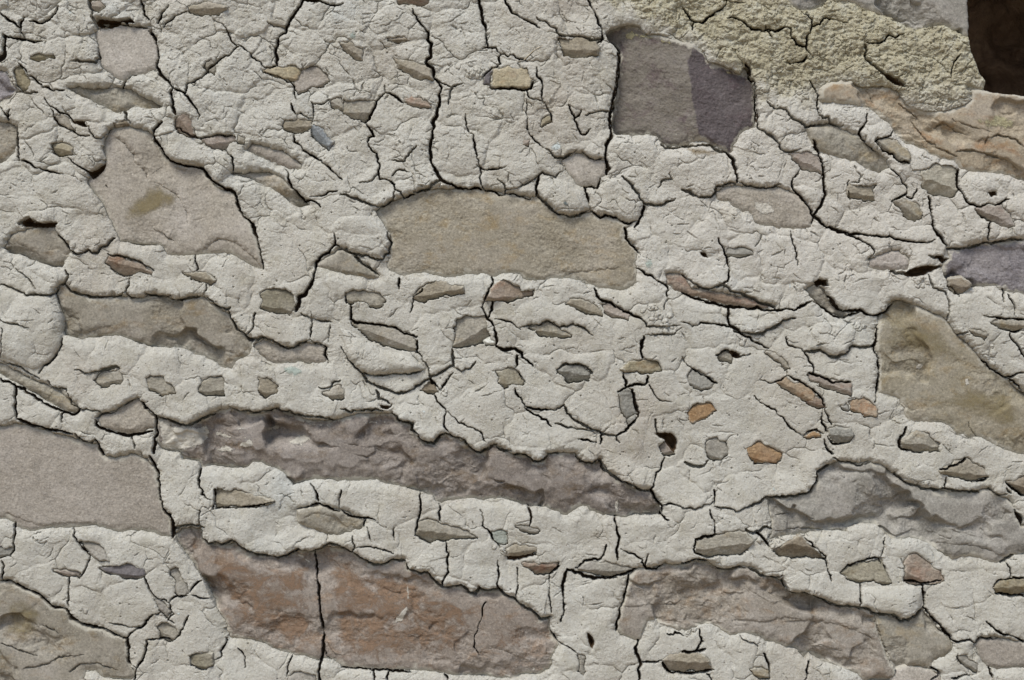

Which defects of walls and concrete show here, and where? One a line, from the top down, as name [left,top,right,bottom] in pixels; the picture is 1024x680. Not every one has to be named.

crack [0,6,90,137]
crack [123,0,343,269]
crack [295,239,423,360]
crack [413,10,539,200]
crack [478,0,889,454]
crack [790,116,947,258]
crack [1,379,175,538]
peeling [159,418,253,452]
peeling [290,435,310,446]
crack [2,522,206,679]
crack [549,490,715,680]
crack [809,541,1023,643]